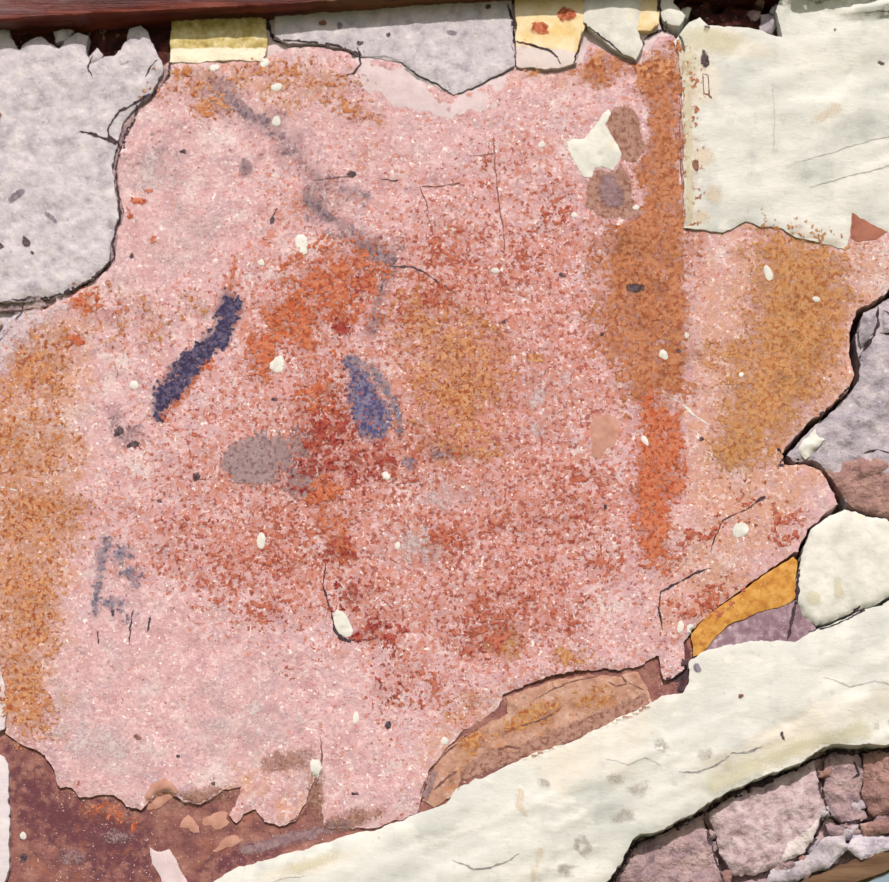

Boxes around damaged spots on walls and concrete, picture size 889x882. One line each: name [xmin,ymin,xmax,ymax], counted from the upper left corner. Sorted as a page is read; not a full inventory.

spalling [12,29,132,65]
spalling [677,0,778,36]
crack [0,31,171,340]
rust [241,39,865,727]
spalling [783,299,889,521]
rust [0,280,215,752]
peeling [0,730,451,882]
rust [261,749,382,831]
crack [453,854,518,870]
rust [456,683,649,781]
crack [607,746,889,882]
spalling [612,748,889,882]